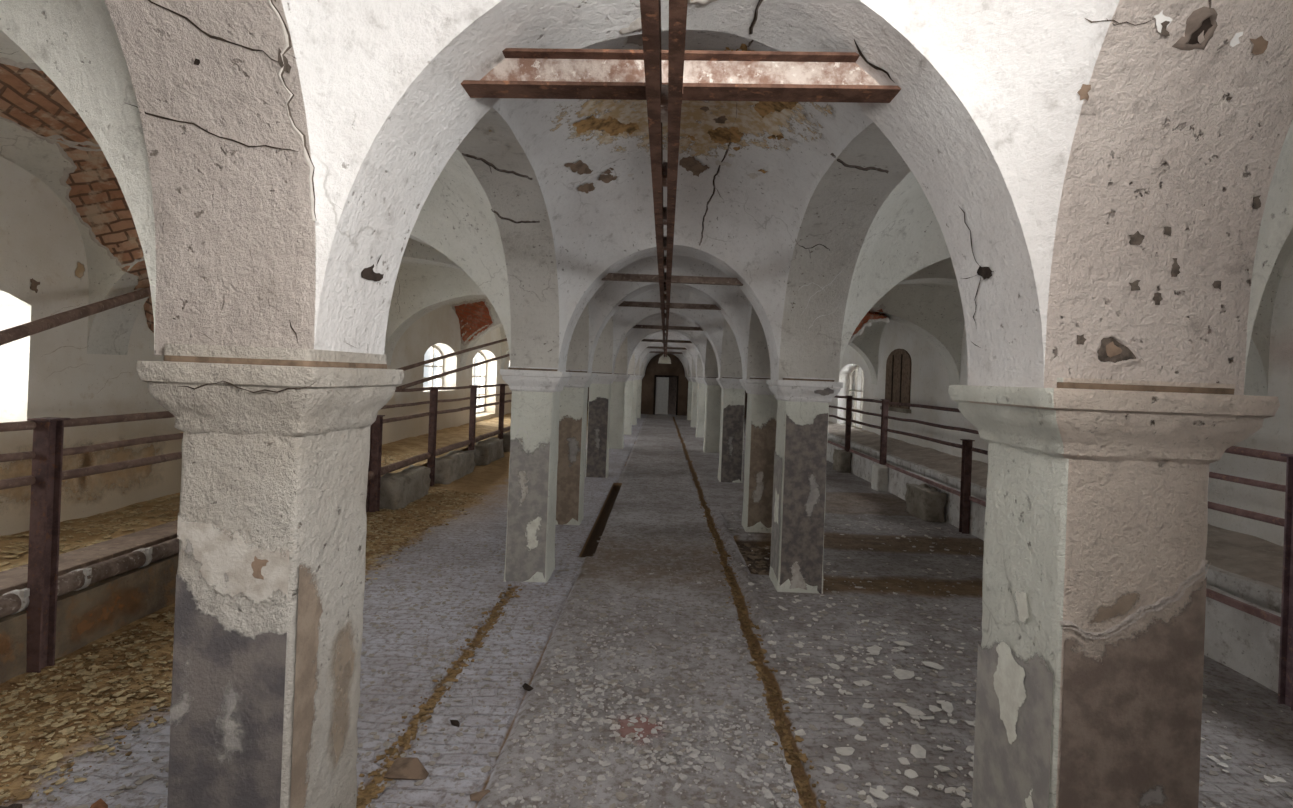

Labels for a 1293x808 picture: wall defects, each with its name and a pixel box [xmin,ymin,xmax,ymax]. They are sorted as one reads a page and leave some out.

crack [148,0,279,63]
crack [747,0,763,47]
spalling [1085,0,1218,51]
flaking render [0,57,154,333]
crack [126,101,298,152]
water stain [550,99,833,194]
crack [960,208,993,348]
spalling [1077,330,1142,370]
water stain [721,405,782,581]
peeling [177,515,290,612]
water stain [167,565,355,808]
peeling [972,577,1207,808]